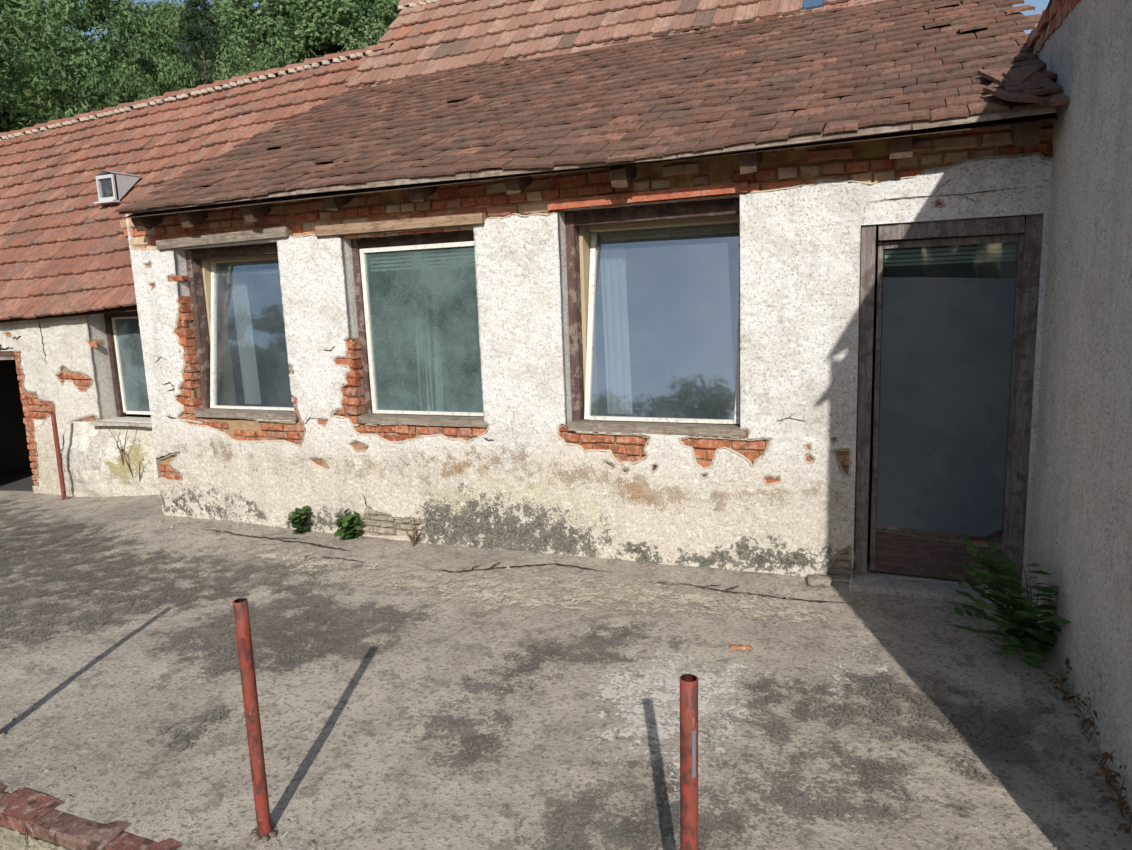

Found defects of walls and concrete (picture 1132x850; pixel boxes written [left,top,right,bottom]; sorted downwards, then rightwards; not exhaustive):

spalling [120,121,1054,268]
spalling [13,351,56,487]
spalling [55,365,93,393]
damp [62,432,150,491]
damp [160,483,347,532]
spalling [172,296,489,452]
spalling [557,424,658,474]
damp [411,445,840,576]
spalling [680,429,771,479]
damp [0,498,430,691]
damp [144,704,238,759]
damp [380,573,1083,850]